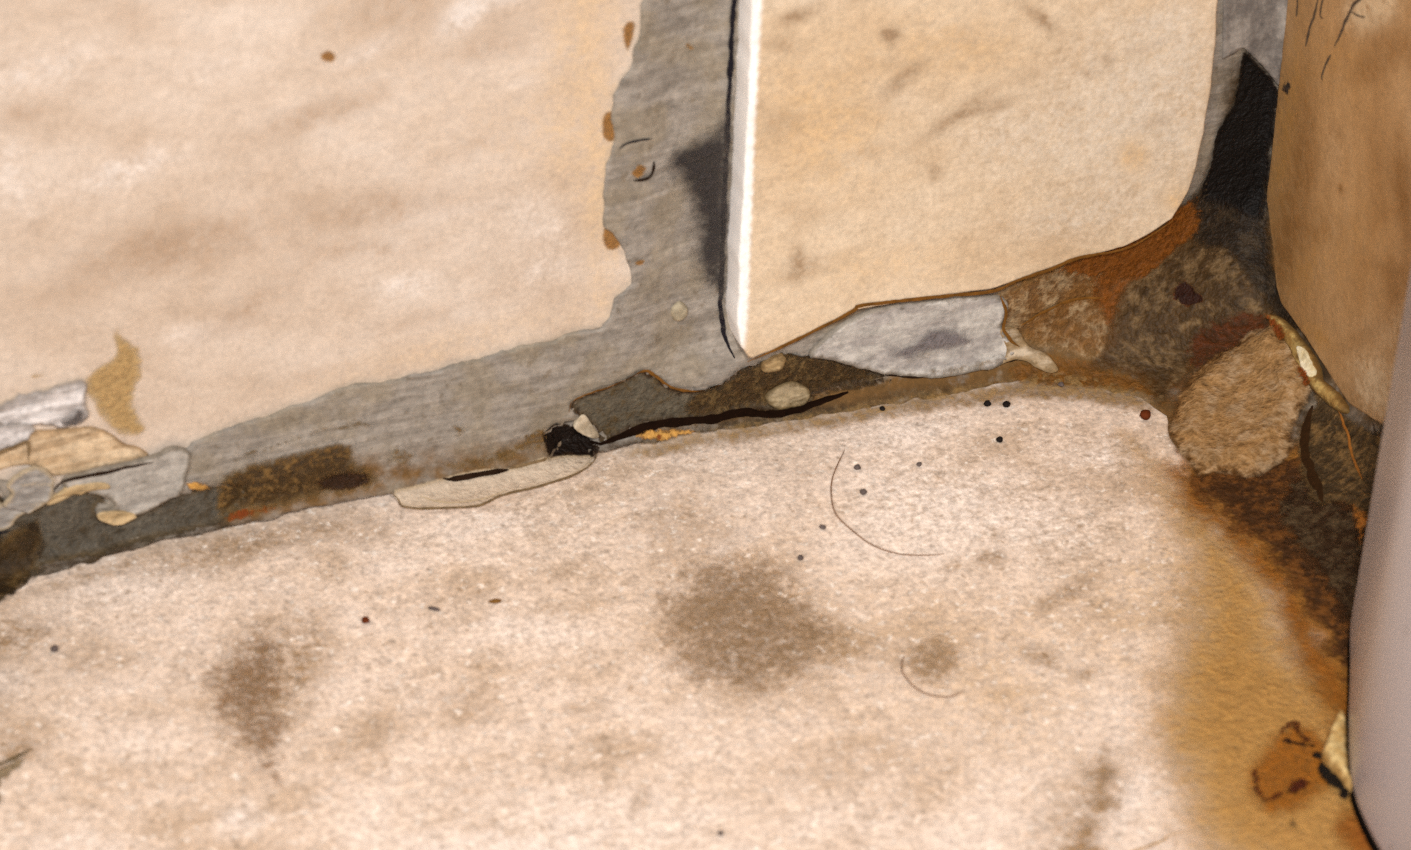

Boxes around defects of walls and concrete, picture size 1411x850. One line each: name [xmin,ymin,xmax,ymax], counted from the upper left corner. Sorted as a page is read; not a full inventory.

leakage [673,126,730,291]
leakage [786,182,1298,431]
spalling [0,380,246,599]
leakage [642,426,772,455]
crack [590,391,849,445]
leakage [1298,394,1384,511]
rust [1176,445,1369,688]
rust [1251,720,1327,825]
rust [1336,808,1371,850]